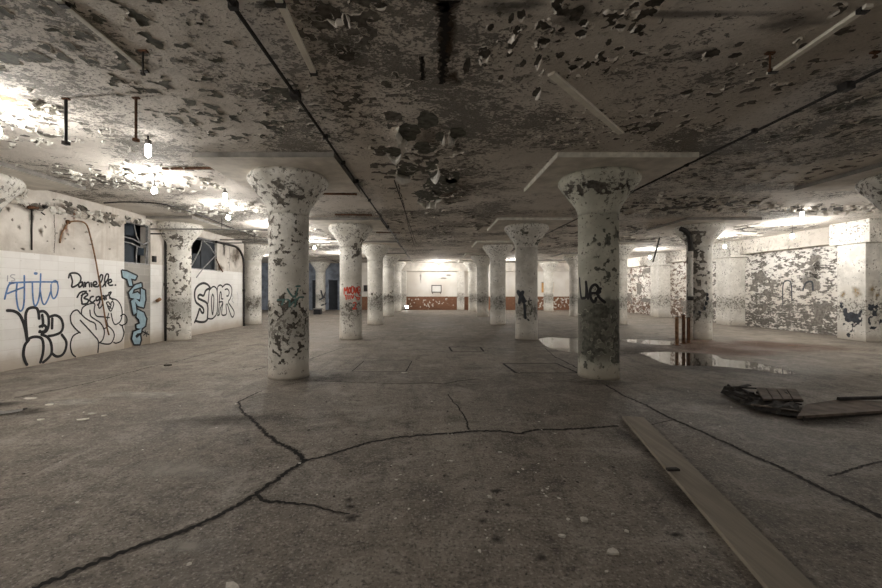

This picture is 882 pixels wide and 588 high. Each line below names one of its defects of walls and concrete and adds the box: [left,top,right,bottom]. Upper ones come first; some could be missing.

peeling [0,0,504,243]
peeling [452,0,667,80]
peeling [534,37,830,147]
peeling [832,24,856,36]
peeling [0,87,364,276]
peeling [506,115,882,337]
peeling [161,234,193,336]
peeling [247,290,310,368]
peeling [341,290,394,313]
peeling [578,303,620,371]
crack [31,379,619,588]
crack [605,385,882,519]